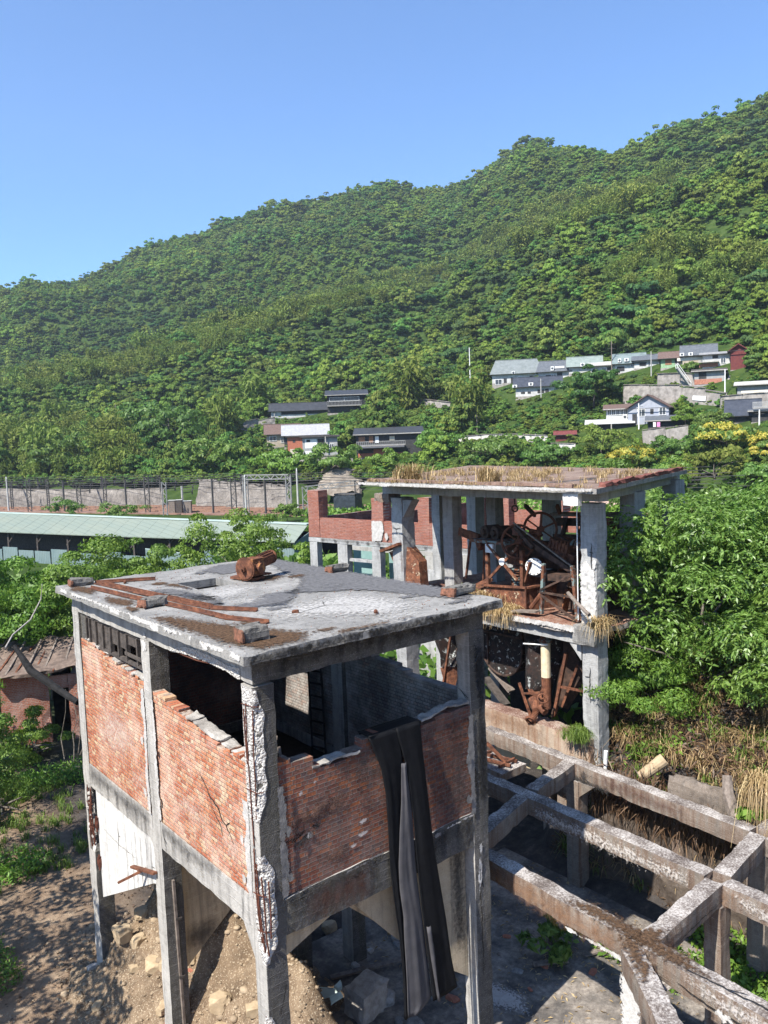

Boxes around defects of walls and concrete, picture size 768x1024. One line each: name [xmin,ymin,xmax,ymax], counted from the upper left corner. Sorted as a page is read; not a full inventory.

spalling [60,588,311,967]
crack [199,773,256,853]